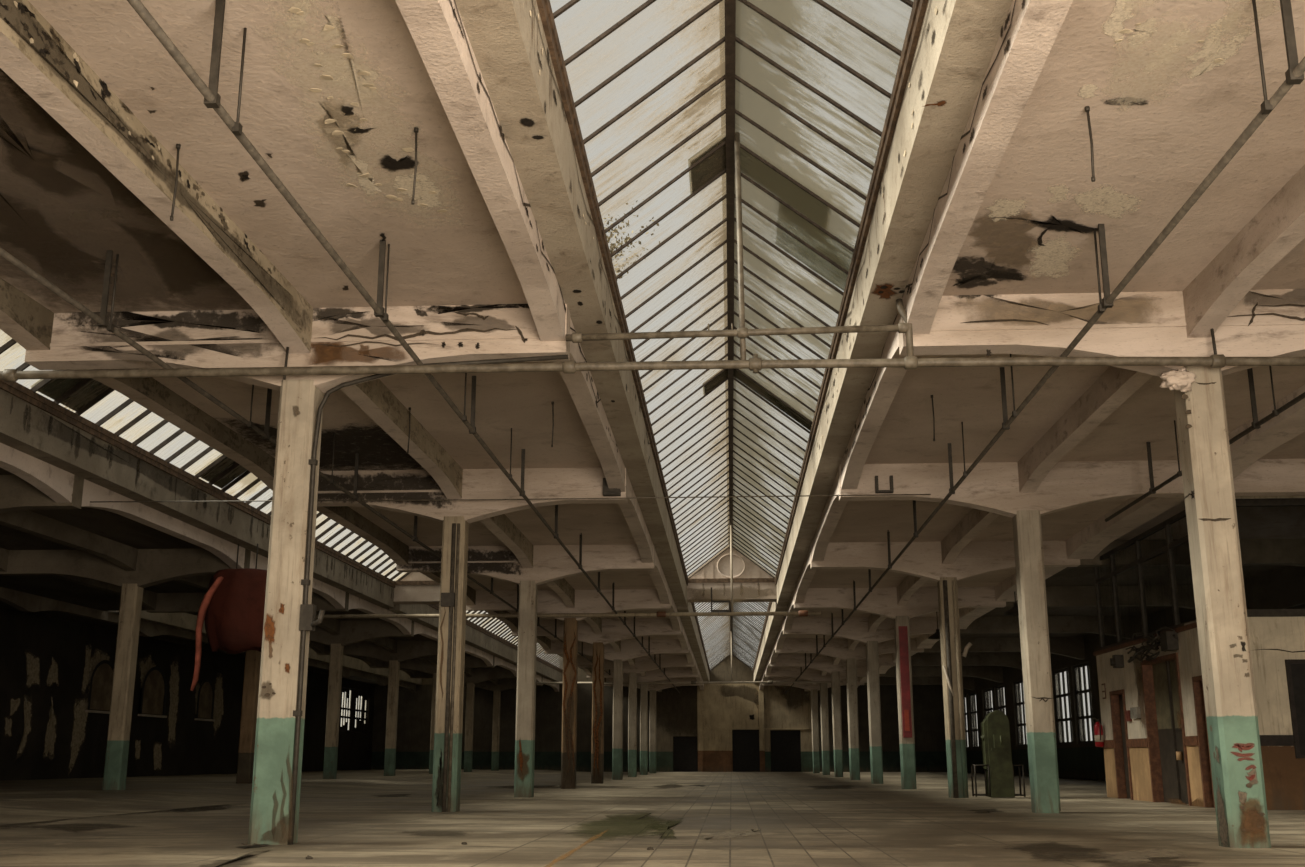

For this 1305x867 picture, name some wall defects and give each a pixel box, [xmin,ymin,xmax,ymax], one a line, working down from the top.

peeling [0,1,229,229]
peeling [902,0,1025,297]
spalling [996,216,1098,246]
crack [317,312,527,349]
crack [1227,302,1305,326]
flaking render [5,648,110,770]
flaking render [135,655,179,770]